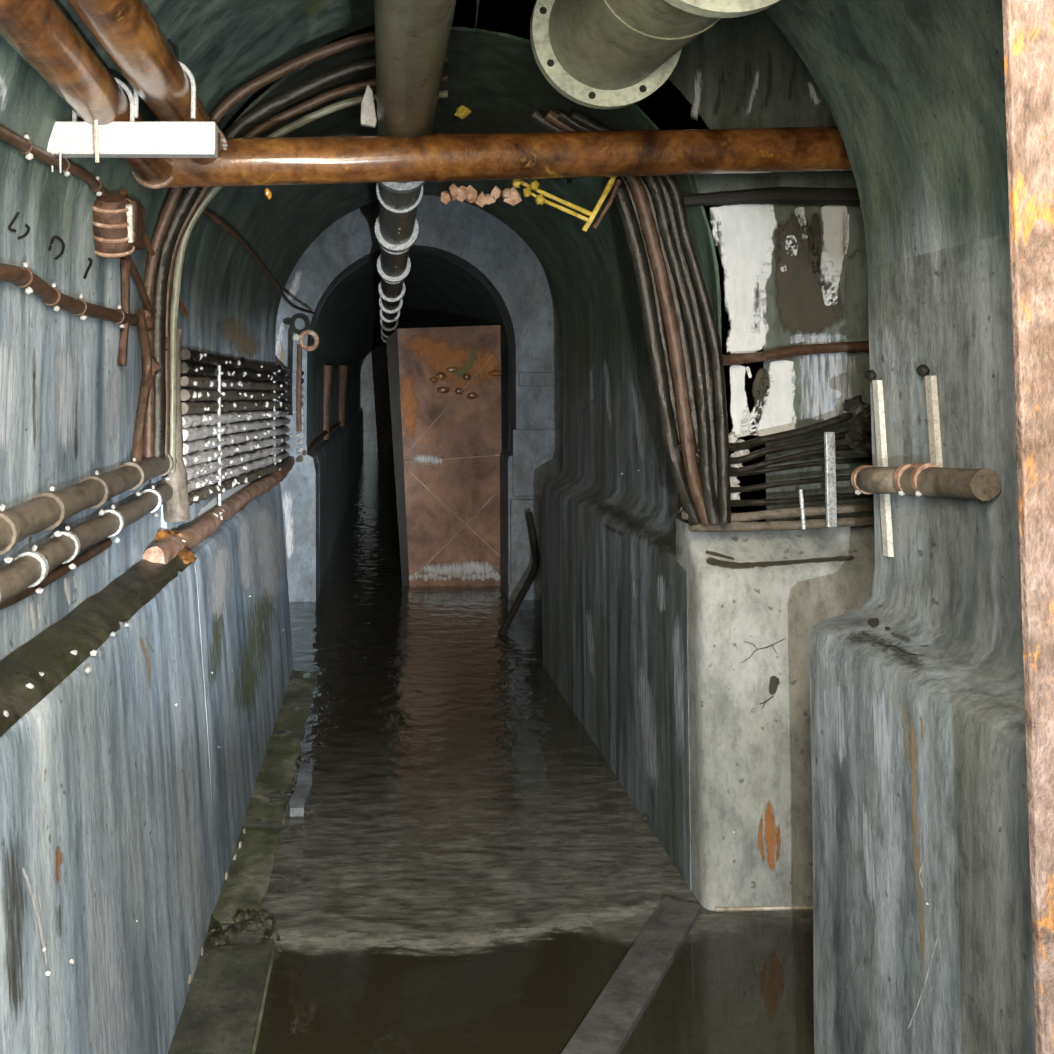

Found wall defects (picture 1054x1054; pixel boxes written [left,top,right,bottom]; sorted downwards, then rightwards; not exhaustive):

peeling [710,204,850,438]
rust [406,335,499,390]
rust [400,372,418,439]
crack [741,638,786,663]
rust [758,802,780,868]
rust [903,708,924,966]
water stain [5,841,47,1012]